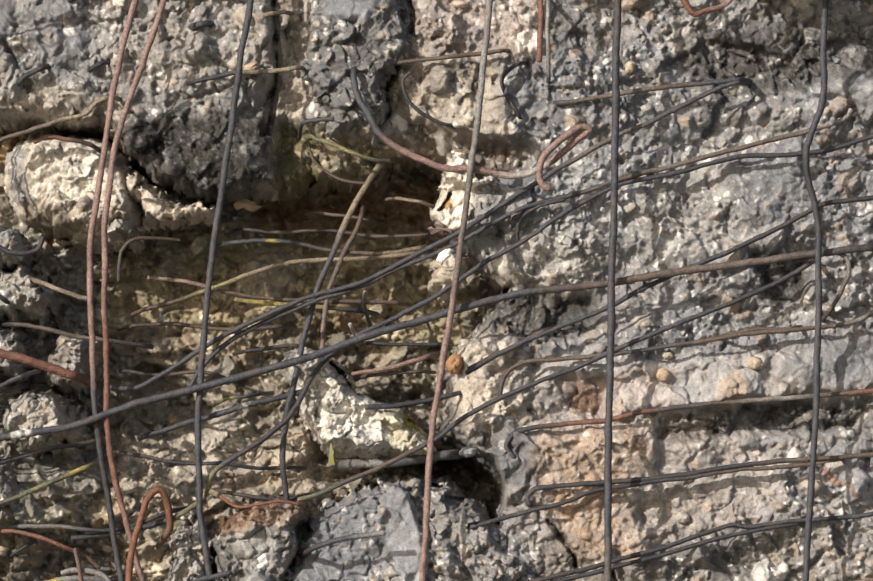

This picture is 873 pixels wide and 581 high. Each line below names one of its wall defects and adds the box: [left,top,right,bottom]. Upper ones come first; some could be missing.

spalling [0,0,454,581]
crack [256,0,291,136]
spalling [331,0,873,581]